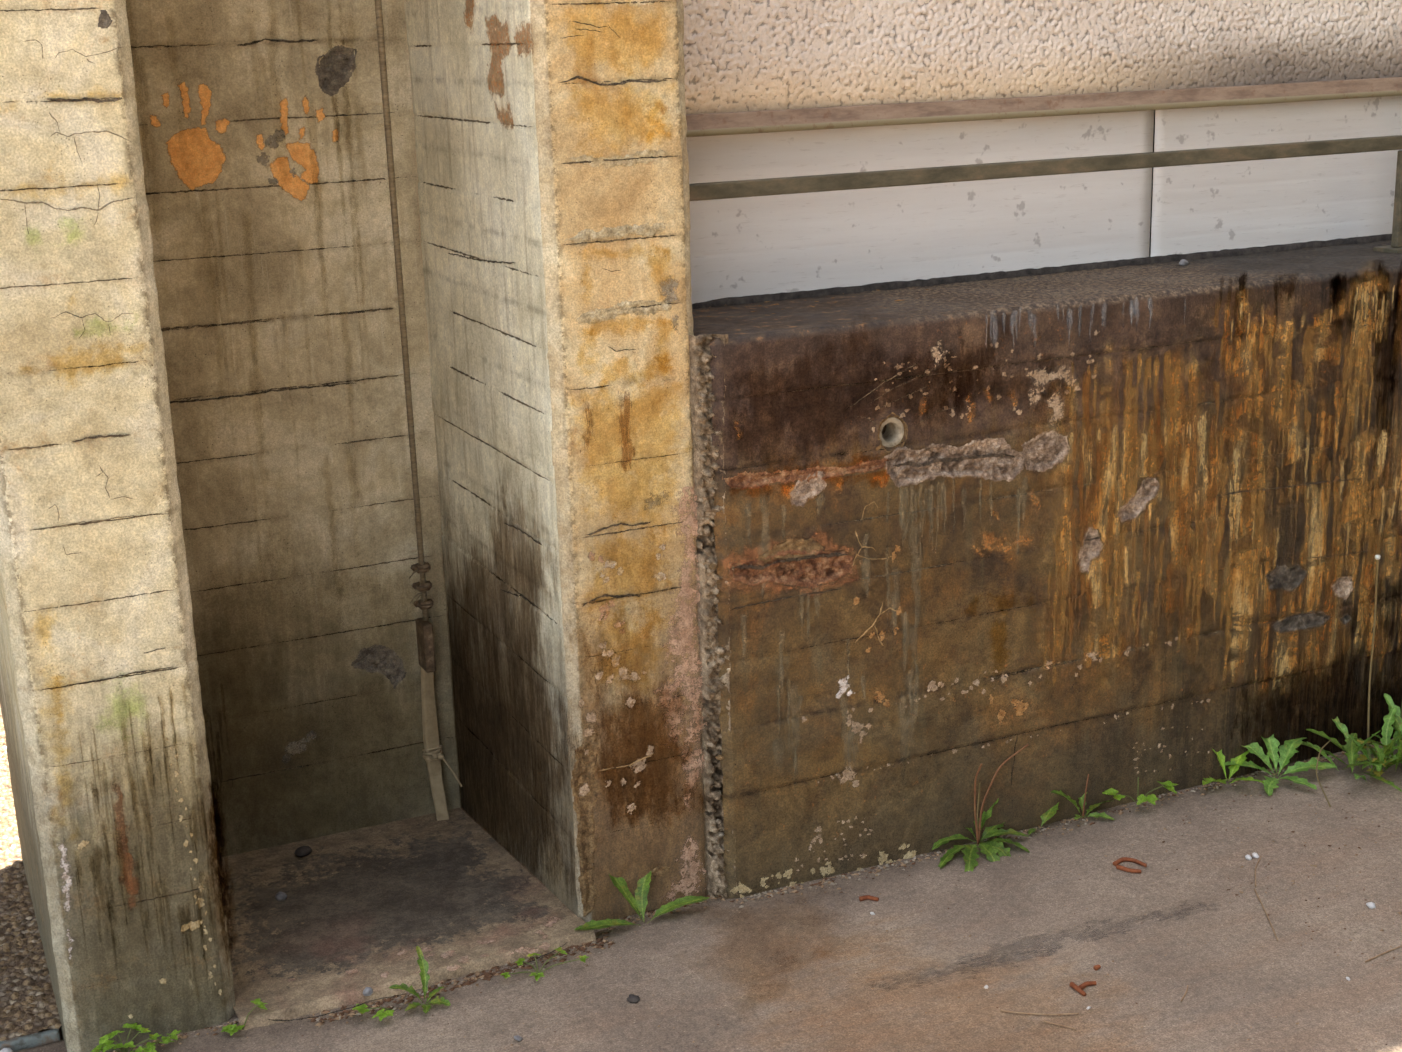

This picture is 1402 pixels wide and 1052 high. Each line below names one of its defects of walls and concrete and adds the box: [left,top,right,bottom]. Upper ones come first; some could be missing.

spalling [315,45,358,96]
corrosion [620,393,635,471]
leakage [1286,261,1402,581]
spalling [1117,477,1161,523]
leakage [1228,441,1279,573]
corrosion [722,532,861,596]
corrosion [973,511,1032,562]
spalling [1078,526,1104,573]
spalling [571,276,1096,917]
spalling [351,644,407,690]
peeling [1075,652,1103,677]